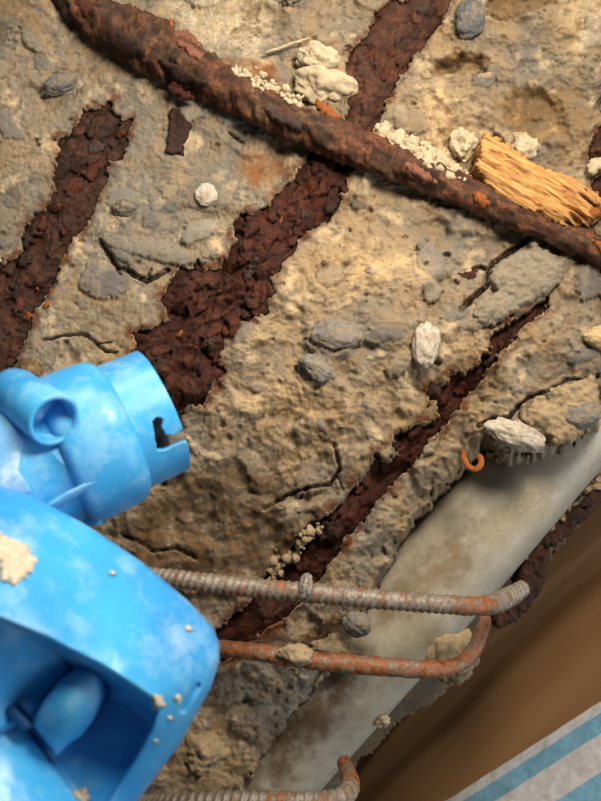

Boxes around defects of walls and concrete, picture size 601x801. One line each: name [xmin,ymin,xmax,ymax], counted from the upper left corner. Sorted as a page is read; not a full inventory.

corrosion [0,94,135,373]
crack [100,242,168,284]
corrosion [51,0,601,423]
crack [43,333,117,354]
crack [478,376,598,428]
corrosion [261,298,550,583]
crack [265,446,344,509]
corrosion [216,598,303,643]
spalling [149,567,530,679]
spalling [138,755,360,801]